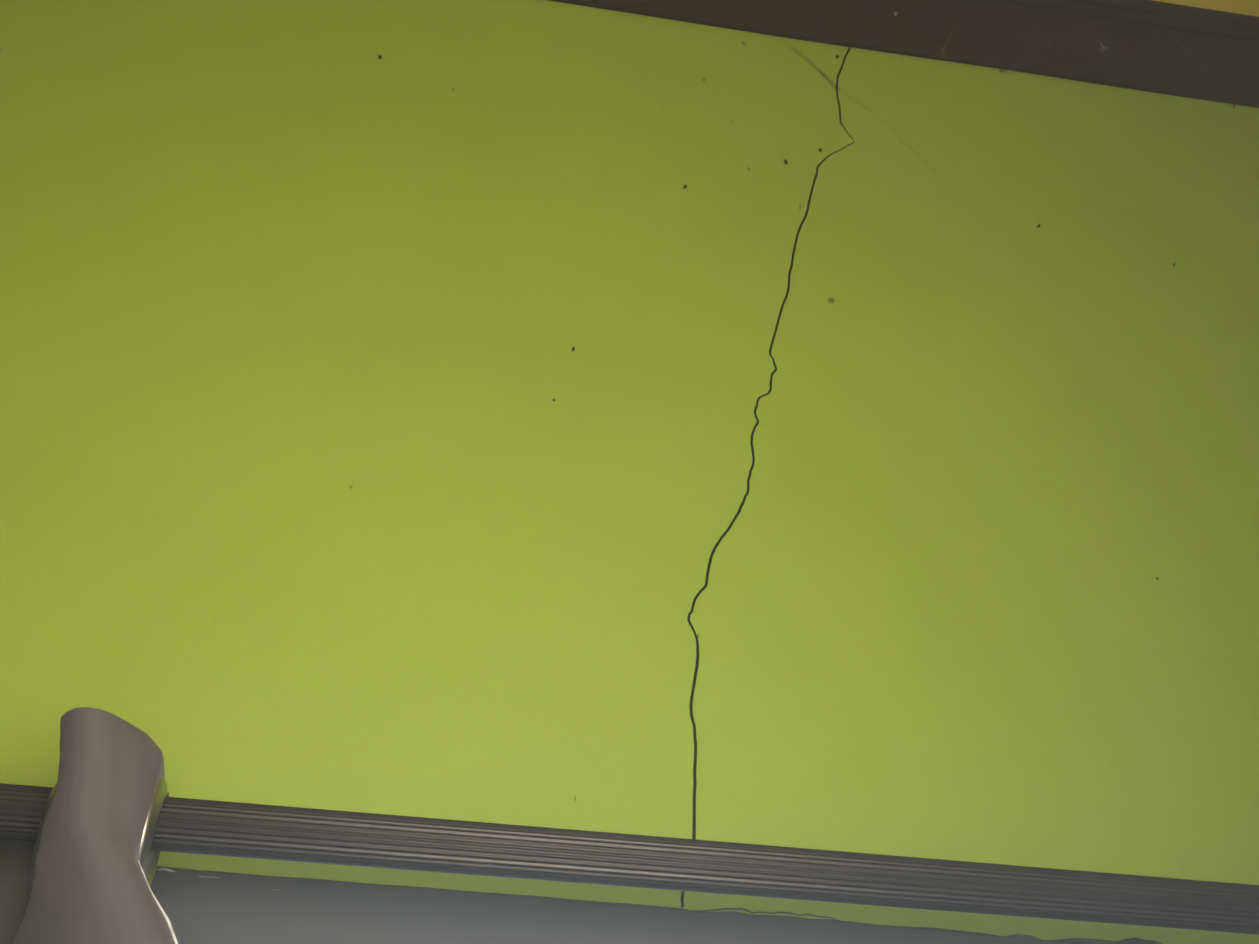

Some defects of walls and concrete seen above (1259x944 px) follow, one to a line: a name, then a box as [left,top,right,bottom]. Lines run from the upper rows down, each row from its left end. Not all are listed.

crack [687,47,855,839]